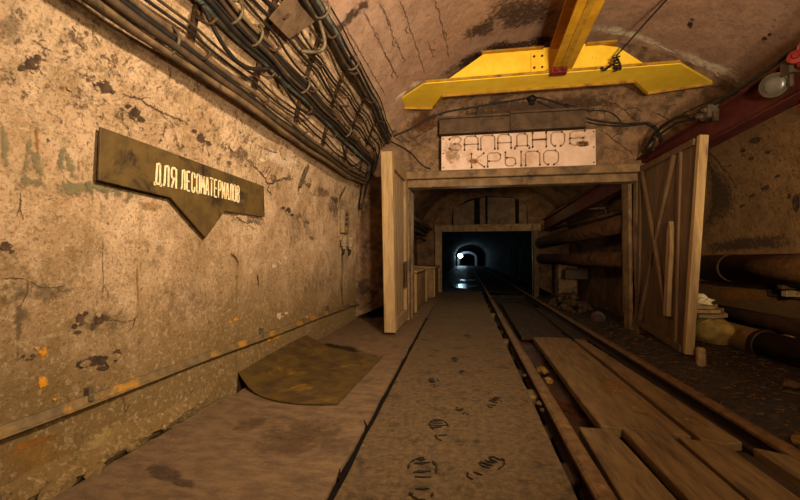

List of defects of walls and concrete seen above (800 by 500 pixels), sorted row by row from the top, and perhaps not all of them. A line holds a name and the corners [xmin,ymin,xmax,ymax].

crack [346,0,449,95]
leakage [465,21,511,50]
spalling [18,54,41,73]
spalling [84,54,130,94]
spalling [125,104,146,122]
crack [125,94,186,122]
spalling [72,311,110,334]
spalling [77,349,122,370]